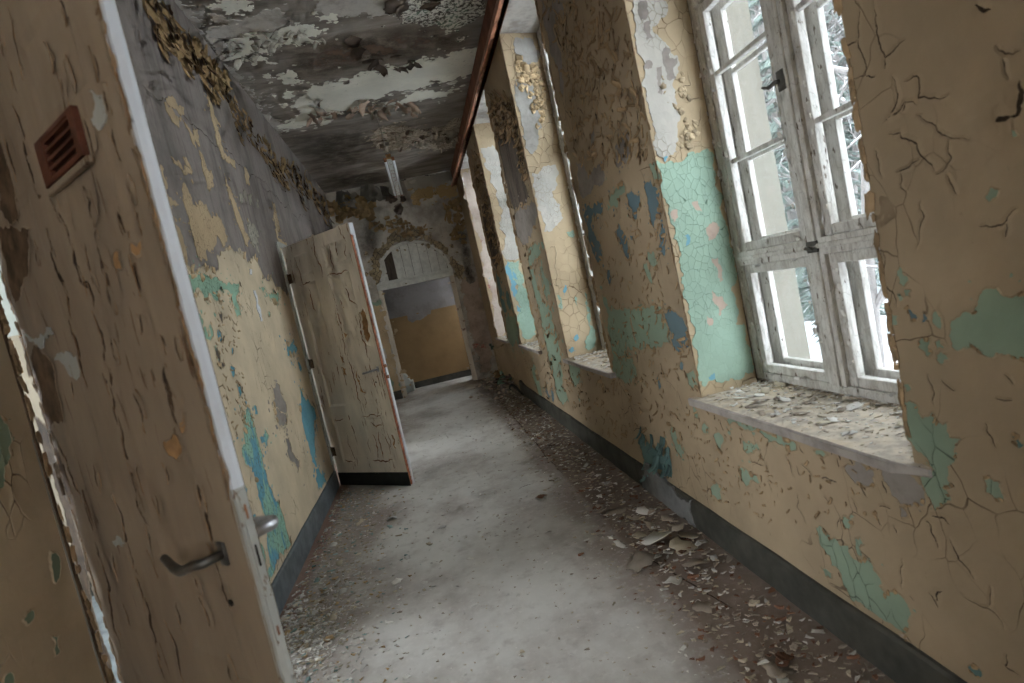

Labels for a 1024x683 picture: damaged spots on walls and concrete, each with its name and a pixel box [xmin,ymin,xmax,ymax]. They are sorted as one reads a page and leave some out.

crack [2,18,69,195]
crack [83,49,123,168]
peeling [93,0,229,501]
spalling [115,0,428,593]
peeling [383,0,443,18]
spalling [442,0,797,524]
peeling [832,0,843,16]
peeling [801,37,963,642]
crack [846,0,971,250]
crack [972,0,1024,136]
crack [979,205,1018,238]
crack [749,446,1021,678]